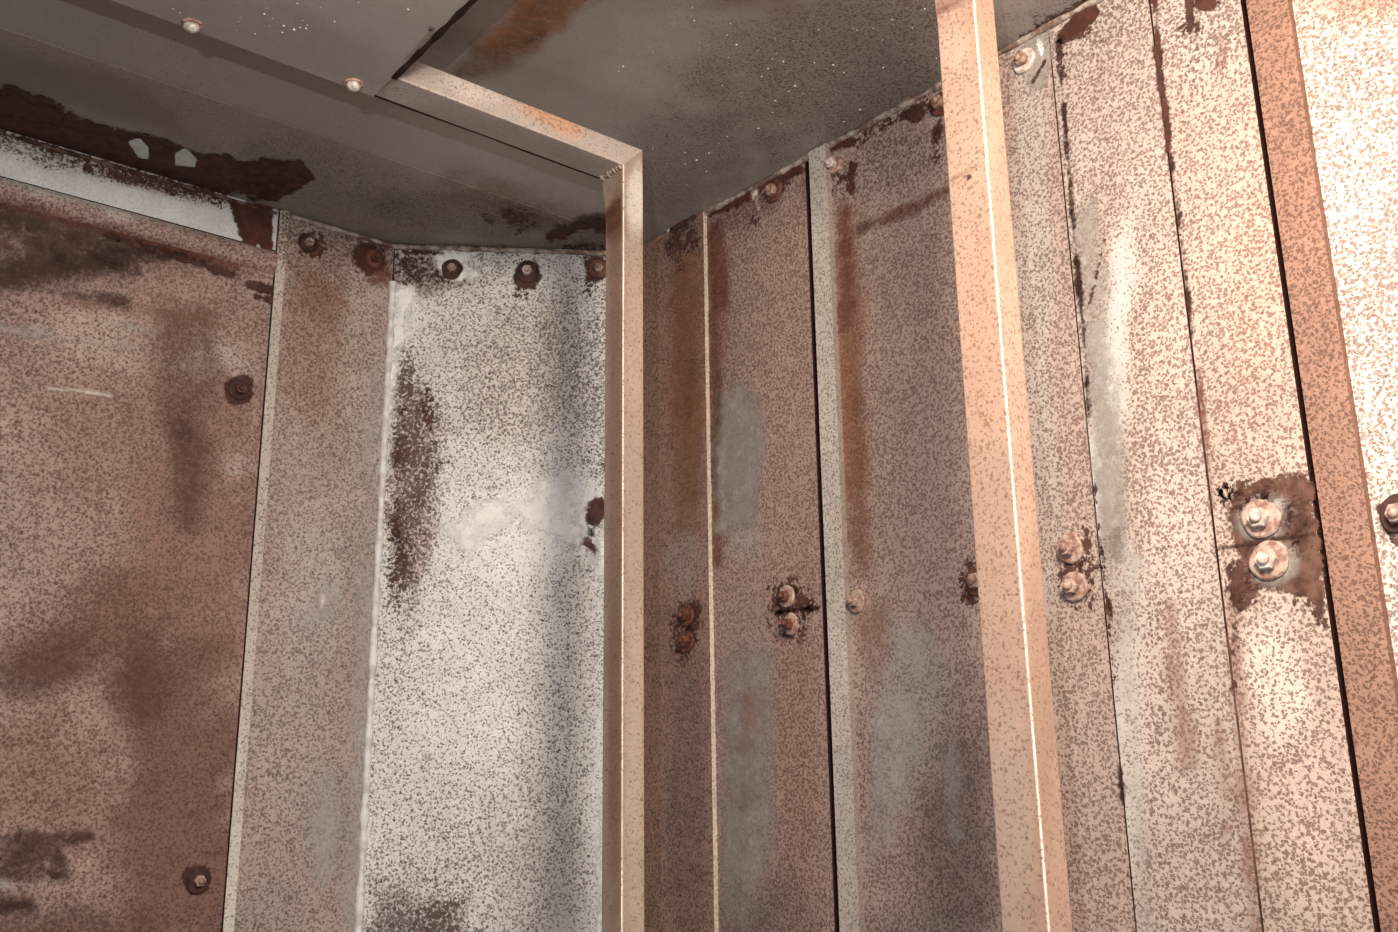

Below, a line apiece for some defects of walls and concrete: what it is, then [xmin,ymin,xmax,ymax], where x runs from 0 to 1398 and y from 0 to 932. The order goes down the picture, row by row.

peeling [0,84,315,251]
rust [297,231,327,259]
rust [345,236,450,287]
rust [462,184,621,300]
rust [958,557,979,605]
rust [1213,470,1329,700]
water stain [0,831,93,880]